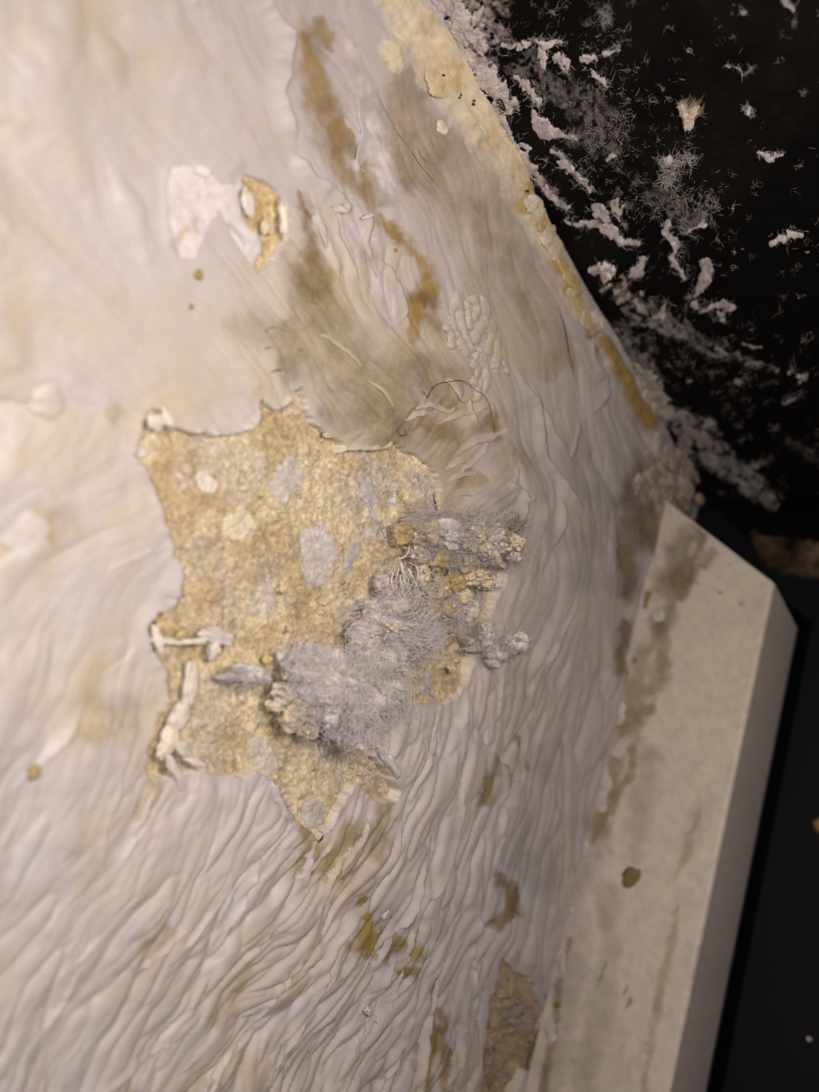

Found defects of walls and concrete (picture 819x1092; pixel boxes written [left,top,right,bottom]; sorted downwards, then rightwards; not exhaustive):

peeling [155,158,289,280]
damp [301,32,332,103]
peeling [239,0,409,324]
damp [372,0,779,510]
spalling [119,391,489,836]
damp [215,486,542,769]
damp [480,776,493,804]
damp [617,467,659,598]
damp [582,531,706,856]
spalling [480,959,561,1092]